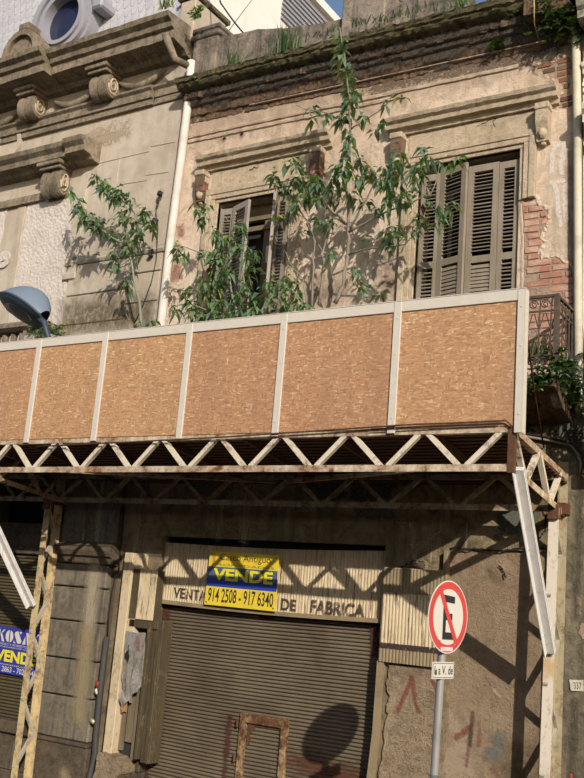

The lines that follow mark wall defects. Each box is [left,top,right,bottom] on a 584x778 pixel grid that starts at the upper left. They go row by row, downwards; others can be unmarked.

damp [186,13,569,106]
peeling [362,49,573,110]
spalling [518,193,574,367]
crack [451,512,547,552]